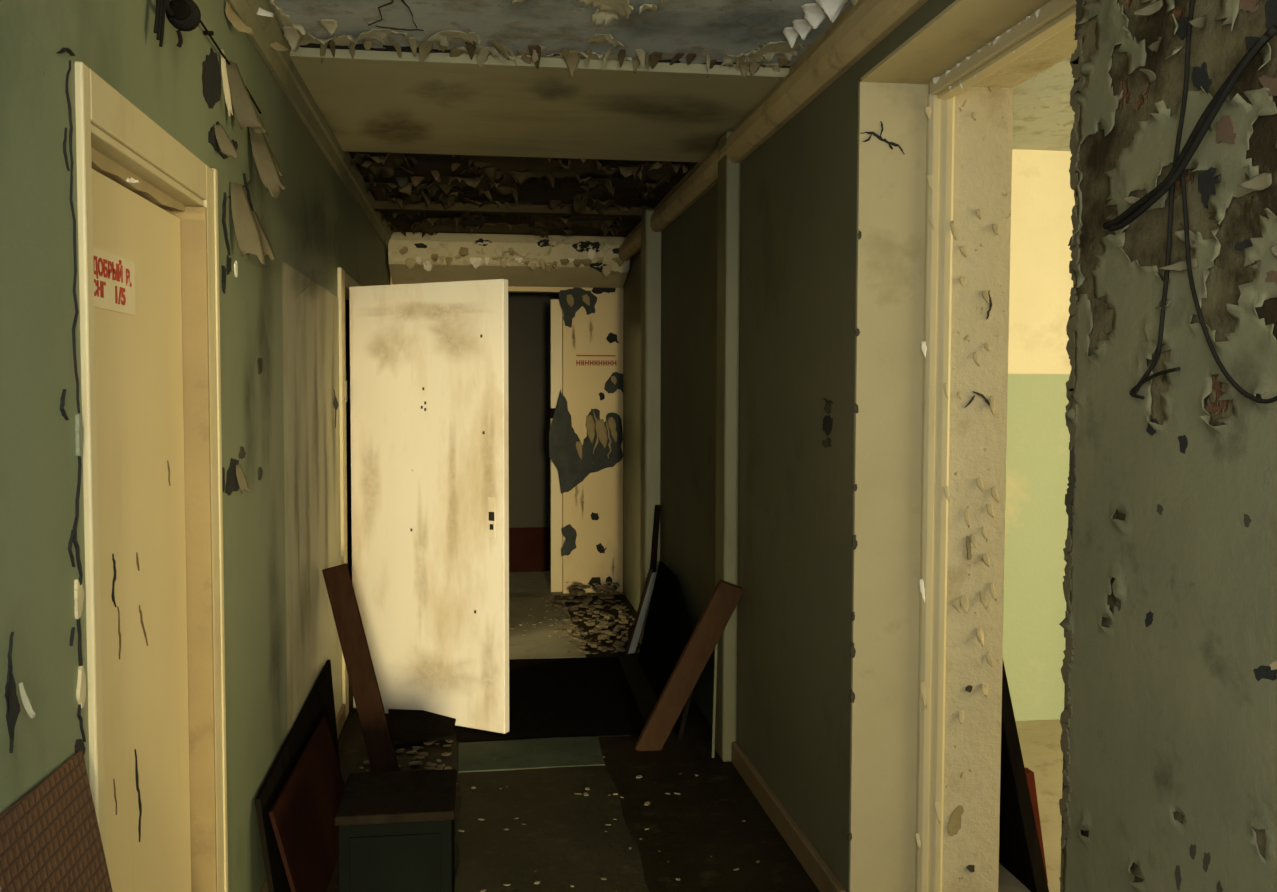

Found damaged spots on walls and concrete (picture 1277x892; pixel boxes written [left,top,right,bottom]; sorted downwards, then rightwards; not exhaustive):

peeling [202,48,285,294]
crack [861,121,905,154]
peeling [350,152,688,344]
peeling [982,290,992,319]
peeling [549,372,623,494]
peeling [943,383,995,415]
peeling [1059,0,1277,892]
peeling [964,478,999,567]
peeling [4,661,36,743]
peeling [965,683,988,697]
peeling [934,801,964,836]